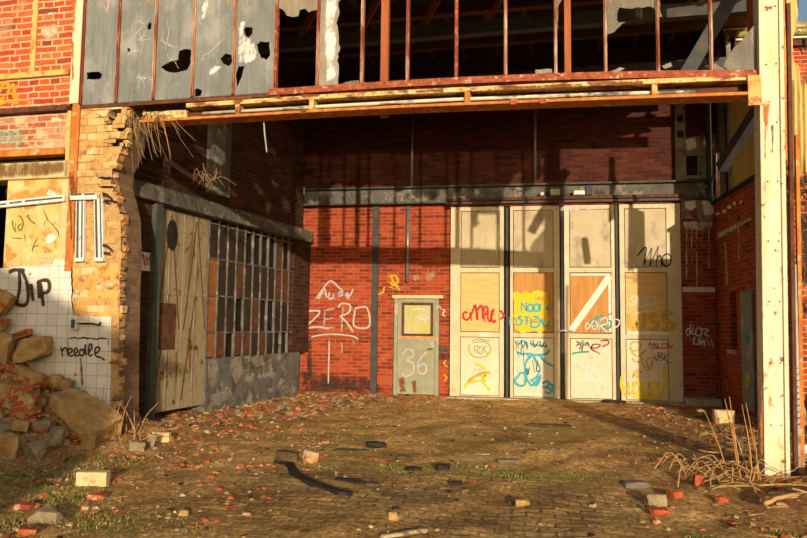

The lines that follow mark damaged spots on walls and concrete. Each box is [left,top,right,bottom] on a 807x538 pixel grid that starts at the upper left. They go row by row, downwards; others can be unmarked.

rust [763,104,774,159]